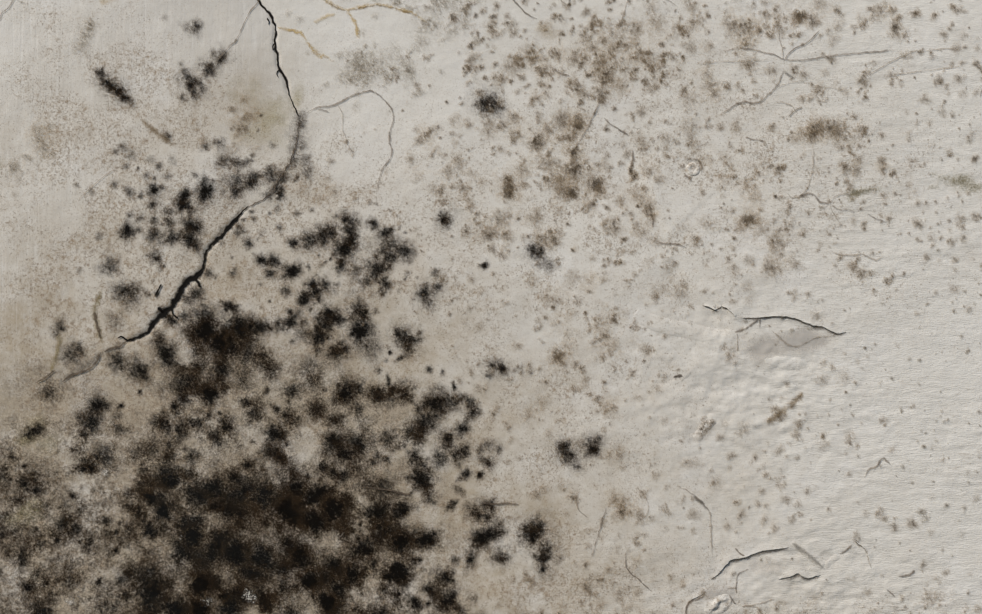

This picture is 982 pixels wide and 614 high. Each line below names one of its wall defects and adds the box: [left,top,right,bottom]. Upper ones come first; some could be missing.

damp [727,1,820,54]
damp [119,163,214,251]
crack [37,0,394,382]
damp [204,141,311,200]
damp [437,176,538,258]
damp [450,3,692,241]
damp [721,203,787,254]
damp [807,113,871,209]
peeling [704,301,846,358]
damp [0,211,506,614]
damp [518,521,551,572]
peeling [681,537,873,614]